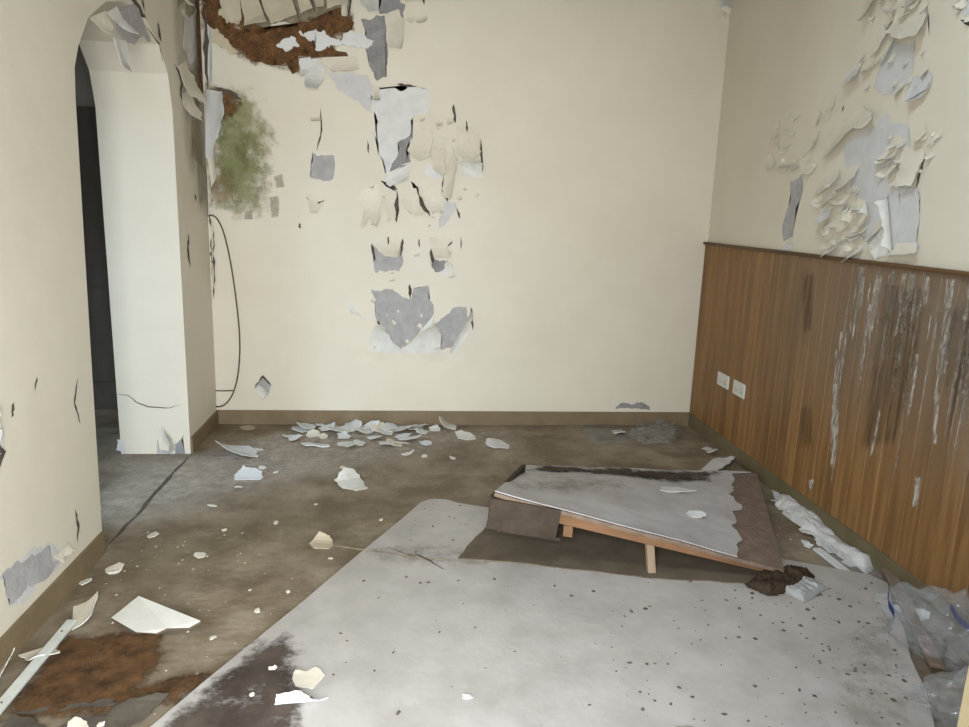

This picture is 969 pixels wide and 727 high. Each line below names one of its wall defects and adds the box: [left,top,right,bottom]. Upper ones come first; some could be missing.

leakage [178,0,284,219]
peeling [90,0,483,362]
peeling [764,0,941,262]
peeling [951,0,969,26]
leakage [830,267,969,480]
flaking render [0,542,75,607]